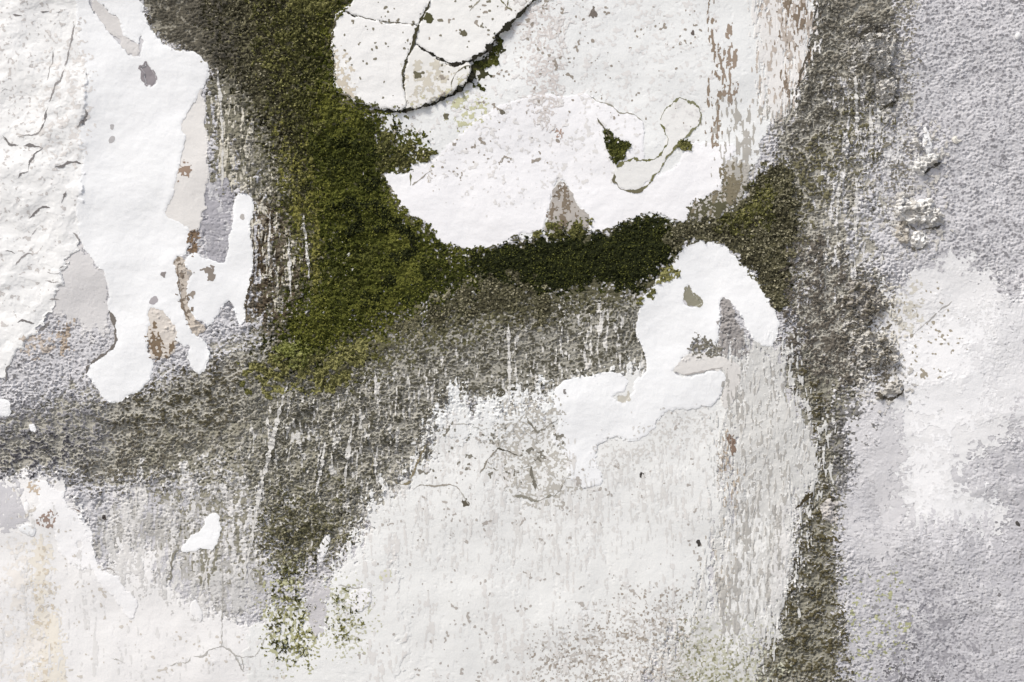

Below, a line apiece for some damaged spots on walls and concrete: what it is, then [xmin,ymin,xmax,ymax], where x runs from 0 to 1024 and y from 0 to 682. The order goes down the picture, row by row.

peeling [0,0,111,381]
peeling [92,0,157,87]
water stain [198,177,234,263]
peeling [165,78,315,342]
water stain [244,112,330,345]
crack [330,0,536,113]
spalling [518,179,598,240]
water stain [546,182,579,231]
peeling [380,0,822,224]
water stain [690,162,744,215]
peeling [0,240,1024,682]
water stain [378,383,798,682]